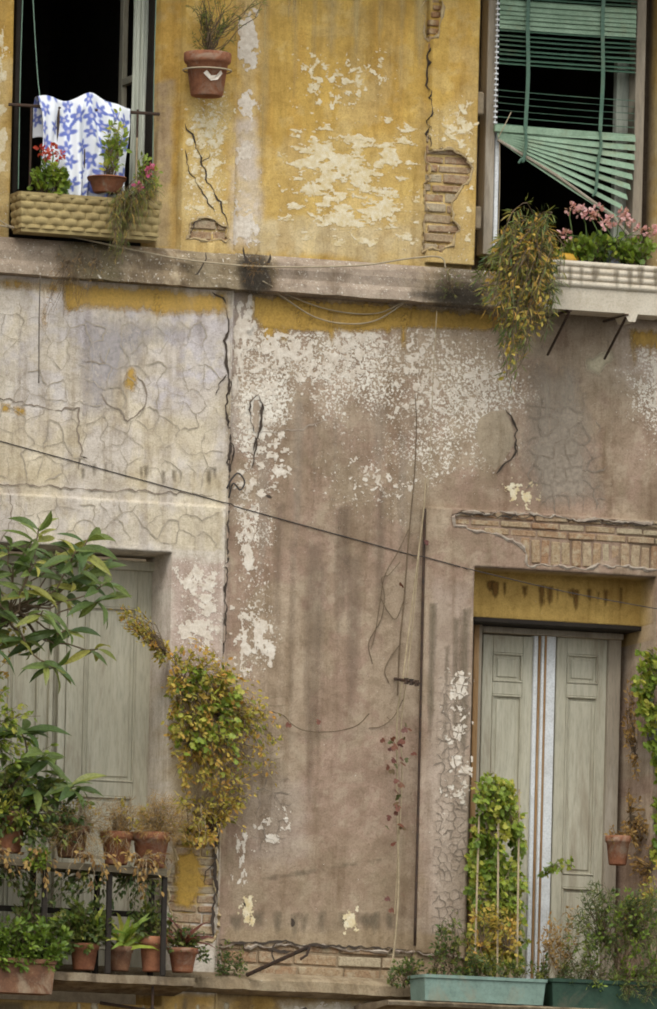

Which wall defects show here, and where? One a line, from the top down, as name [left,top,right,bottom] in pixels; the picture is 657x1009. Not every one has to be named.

peeling [179,89,261,248]
peeling [237,8,261,72]
peeling [277,45,479,254]
crack [425,43,434,149]
crack [0,124,327,654]
peeling [170,294,503,677]
flaking render [451,477,657,572]
crack [456,394,657,527]
crack [431,674,471,942]
crack [203,828,405,965]